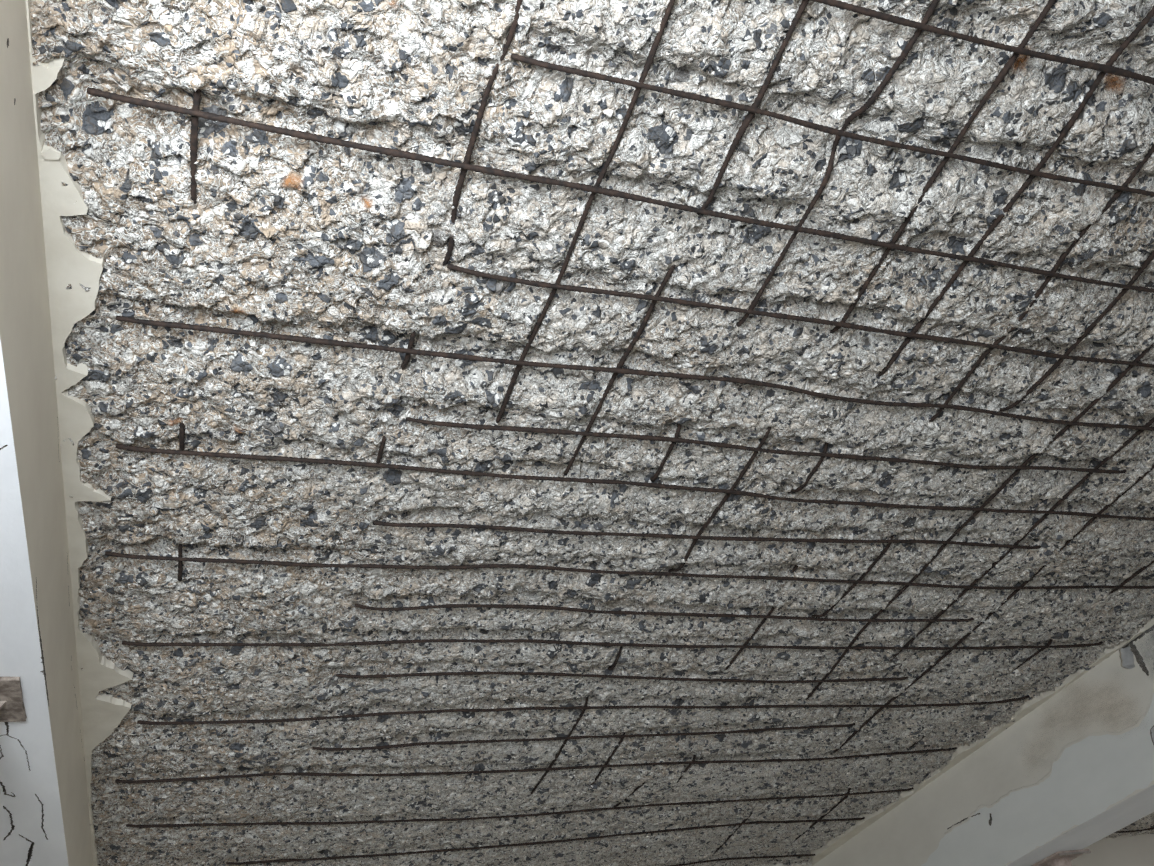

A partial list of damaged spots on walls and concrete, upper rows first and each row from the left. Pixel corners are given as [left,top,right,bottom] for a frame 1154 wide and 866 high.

spalling [87,87,1154,362]
spalling [510,0,1154,286]
peeling [26,0,133,866]
spalling [116,315,1154,517]
spalling [447,263,1154,426]
spalling [105,443,1154,590]
crack [0,722,48,866]
crack [36,581,85,761]
spalling [115,747,957,784]
spalling [137,695,1030,725]
spalling [122,639,1103,650]
spalling [354,603,974,647]